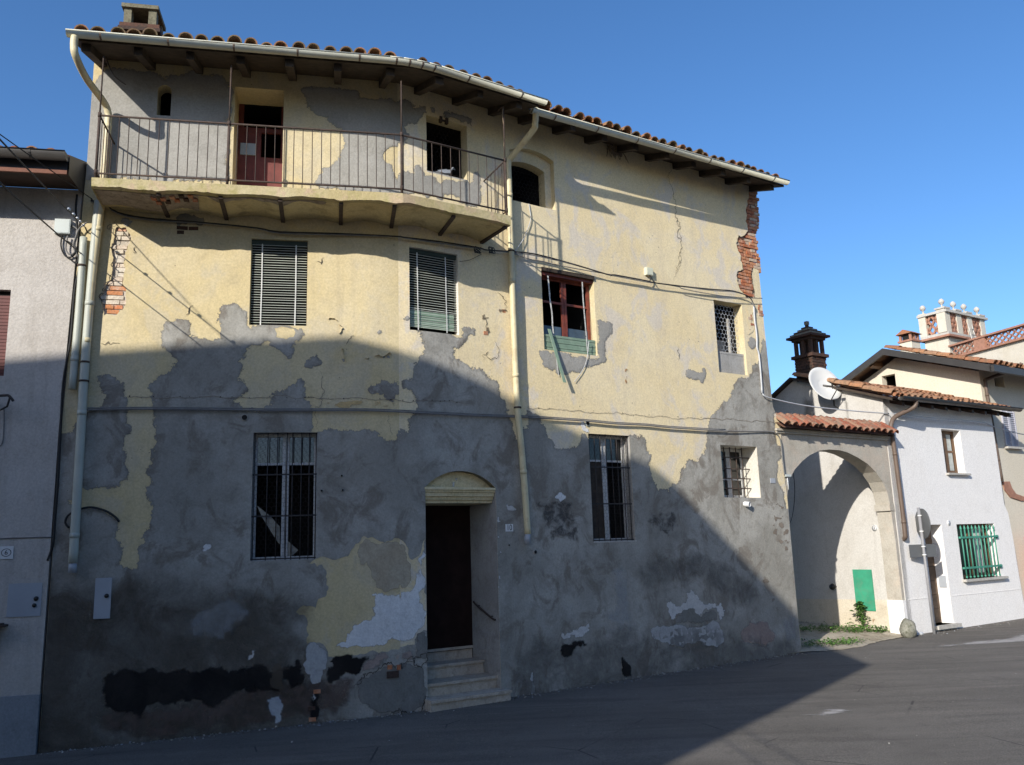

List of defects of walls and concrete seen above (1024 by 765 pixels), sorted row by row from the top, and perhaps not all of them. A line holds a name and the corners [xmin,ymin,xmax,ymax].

flaking render [86,67,482,314]
flaking render [50,192,801,725]
water stain [38,582,412,754]